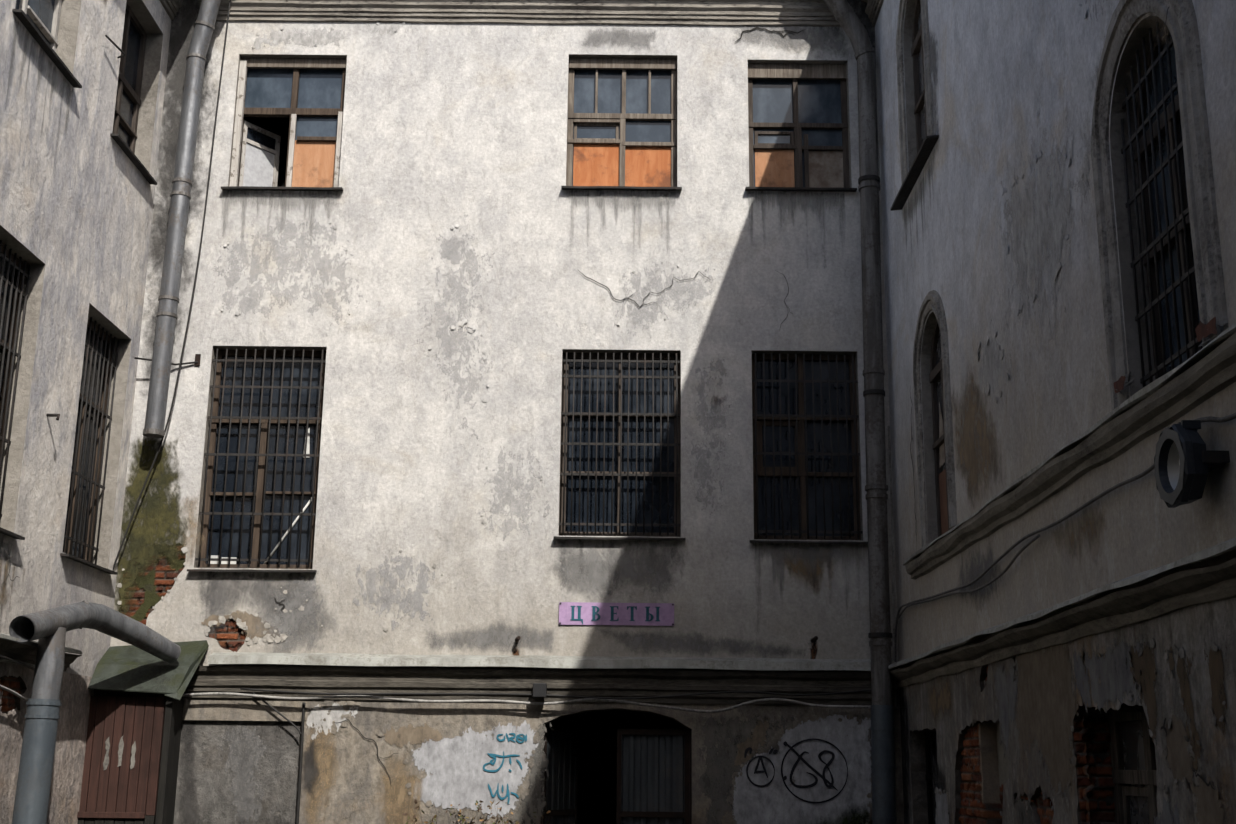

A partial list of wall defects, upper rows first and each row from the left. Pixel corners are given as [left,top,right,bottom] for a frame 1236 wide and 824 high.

leakage [571,190,670,214]
crack [578,270,716,308]
leakage [951,377,997,497]
flaking render [201,610,288,653]
flaking render [935,719,1054,824]
flaking render [1071,694,1121,824]
peeling [1164,643,1227,771]